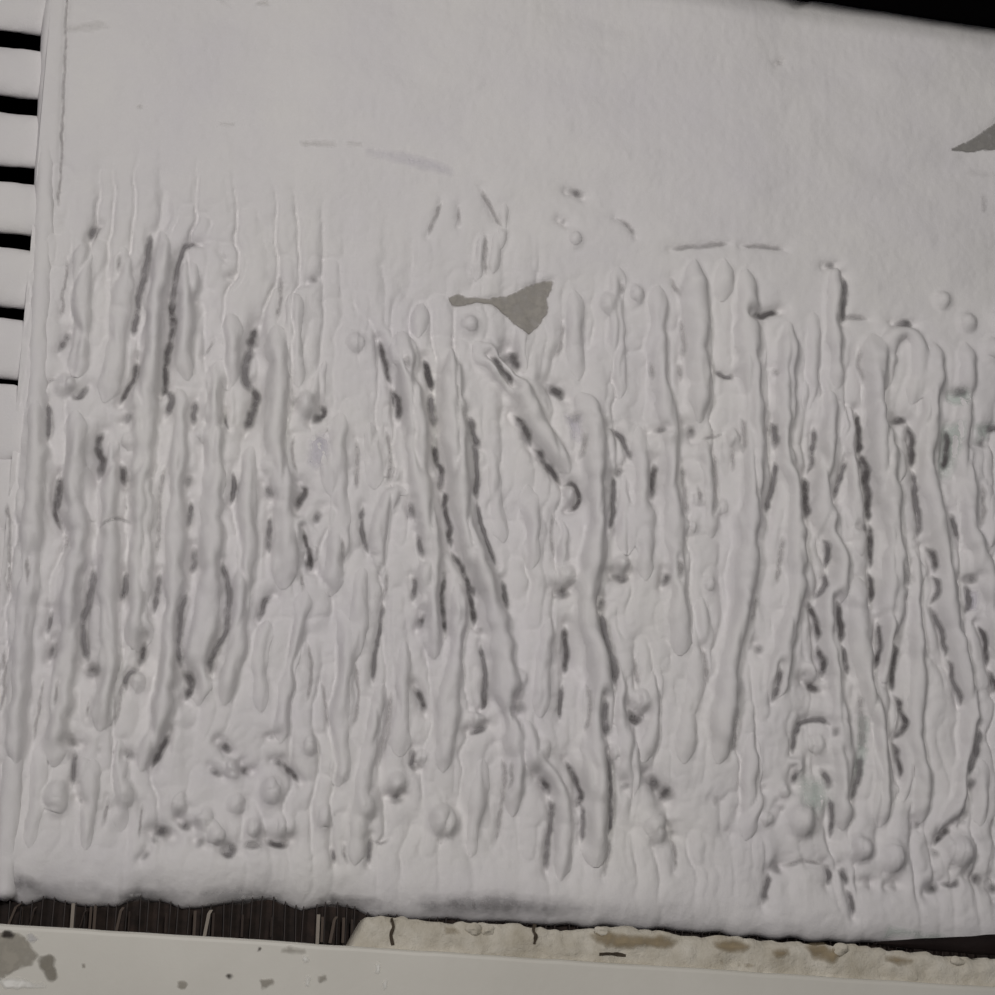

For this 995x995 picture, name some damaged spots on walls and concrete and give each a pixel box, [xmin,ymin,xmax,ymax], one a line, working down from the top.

peeling [952,124,995,152]
peeling [449,281,552,334]
peeling [0,932,56,988]